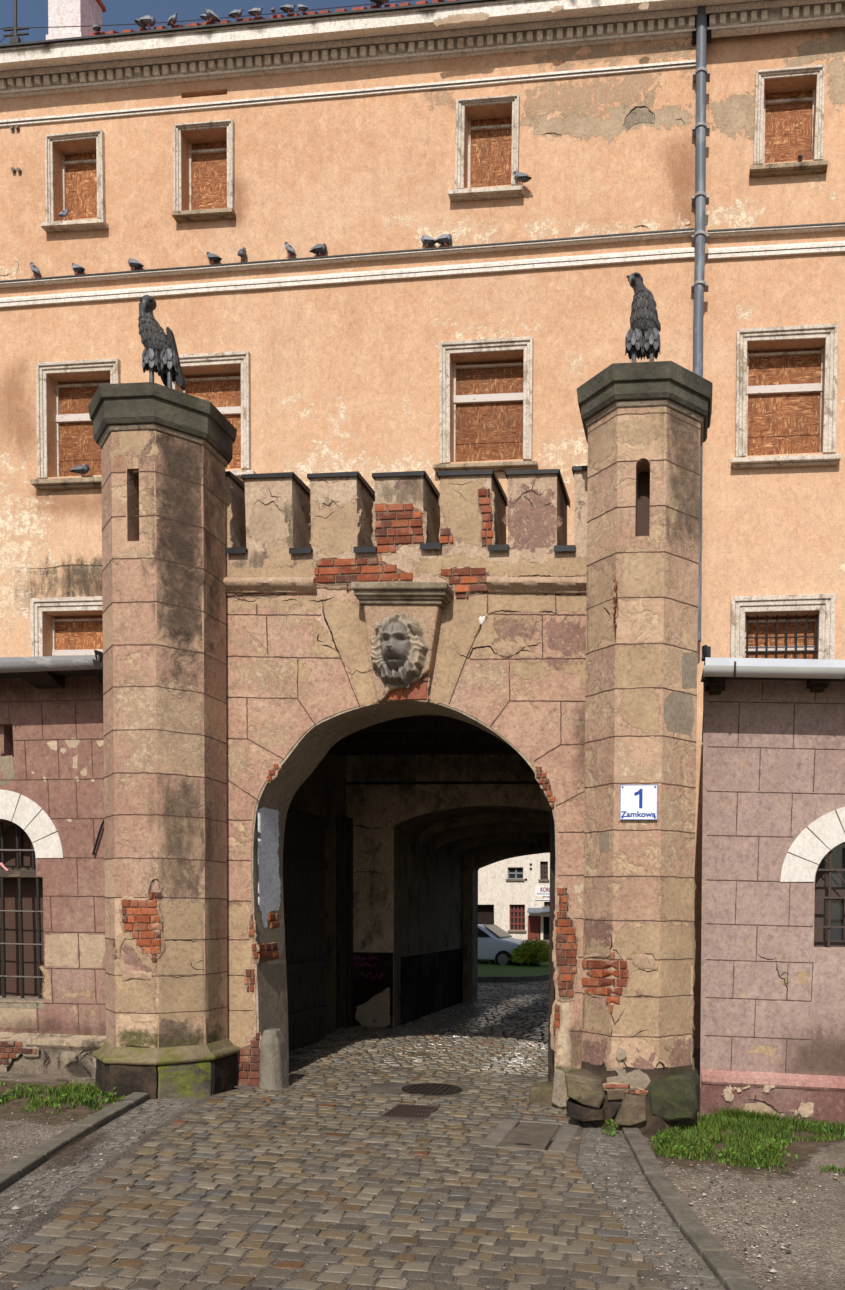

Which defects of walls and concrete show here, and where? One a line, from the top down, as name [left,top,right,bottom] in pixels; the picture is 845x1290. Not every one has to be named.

peeling [516,38,755,144]
peeling [783,27,845,112]
peeling [433,315,541,349]
water stain [48,562,102,597]
water stain [155,434,213,652]
peeling [198,392,676,785]
crack [233,597,370,674]
peeling [682,652,697,689]
peeling [0,857,280,1086]
peeling [550,872,696,1070]
flaking render [603,1082,648,1095]